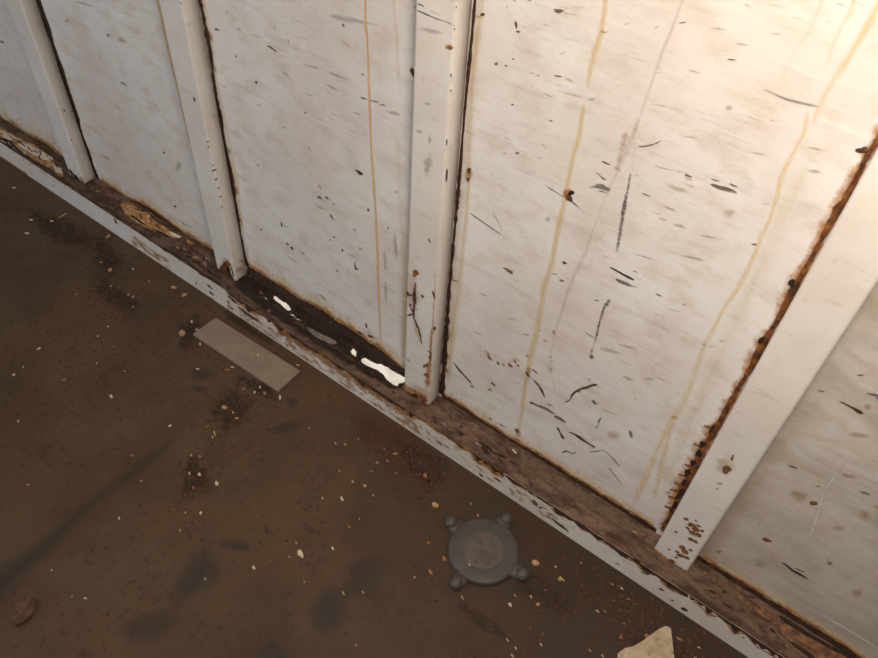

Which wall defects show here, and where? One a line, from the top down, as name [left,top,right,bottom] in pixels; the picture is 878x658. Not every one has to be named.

peeling [0,127,64,177]
peeling [96,186,217,274]
peeling [282,318,337,344]
rust [198,0,878,658]
peeling [709,590,852,658]